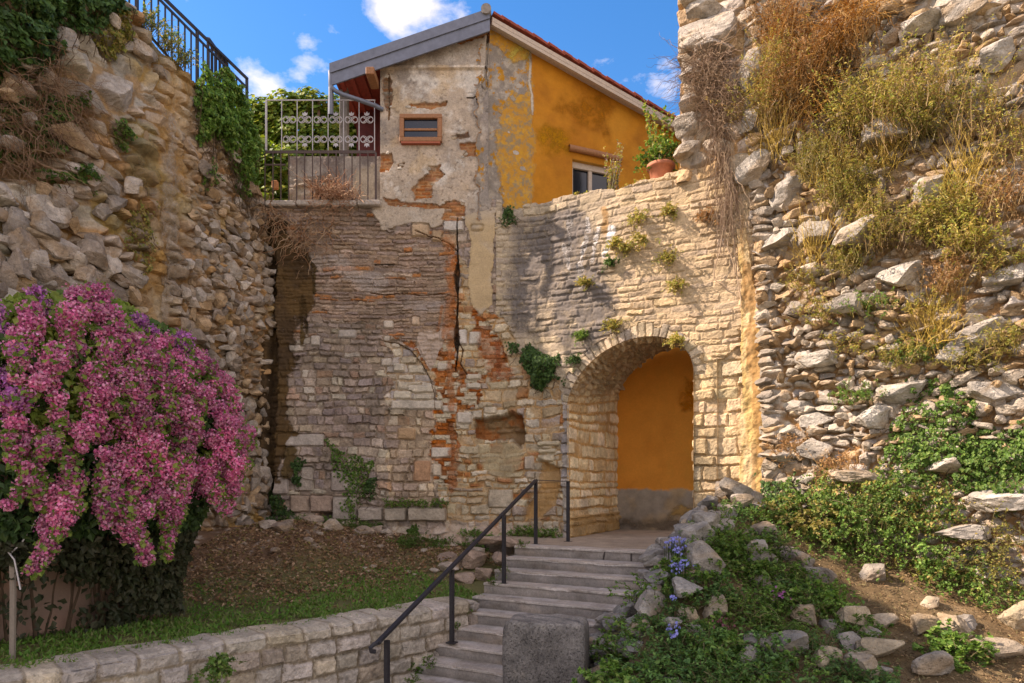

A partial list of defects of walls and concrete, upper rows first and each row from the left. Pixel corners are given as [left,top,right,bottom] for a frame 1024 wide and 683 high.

spalling [379,151,405,172]
peeling [383,33,531,314]
crack [371,228,467,375]
peeling [415,330,444,371]